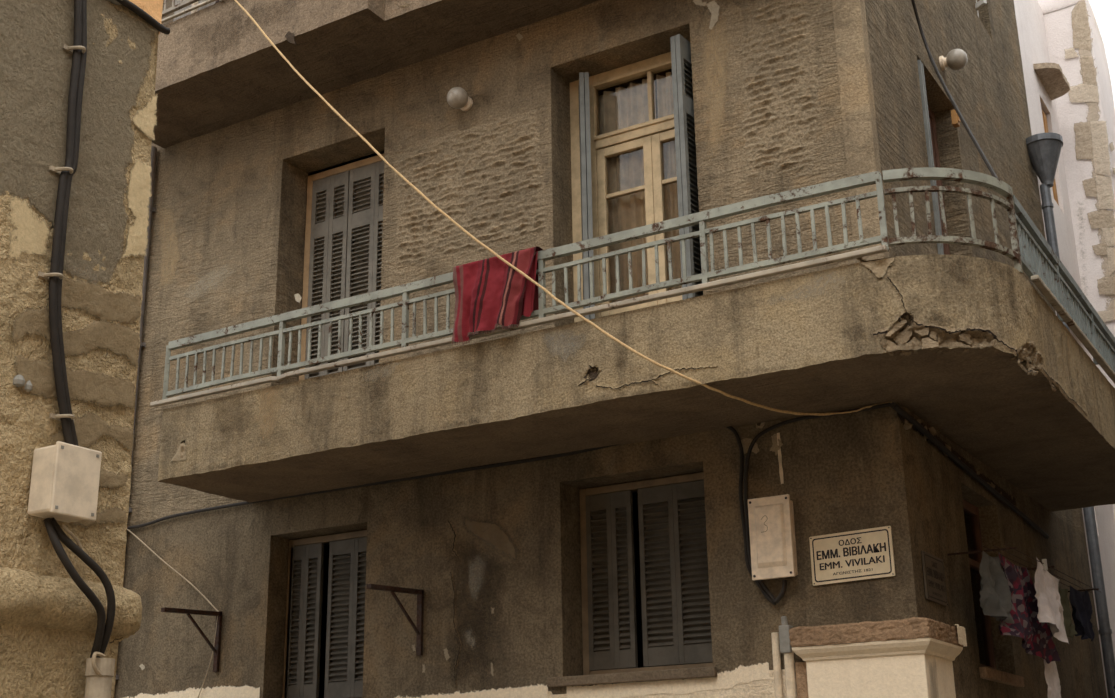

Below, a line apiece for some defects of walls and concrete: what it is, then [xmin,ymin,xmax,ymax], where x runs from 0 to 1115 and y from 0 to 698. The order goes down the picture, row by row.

peeling [693,0,720,30]
peeling [133,96,157,140]
peeling [6,196,49,259]
peeling [123,158,152,257]
peeling [13,277,142,451]
crack [595,366,718,392]
spalling [880,312,998,356]
crack [856,257,1088,416]
spalling [1010,341,1044,370]
peeling [99,469,128,489]